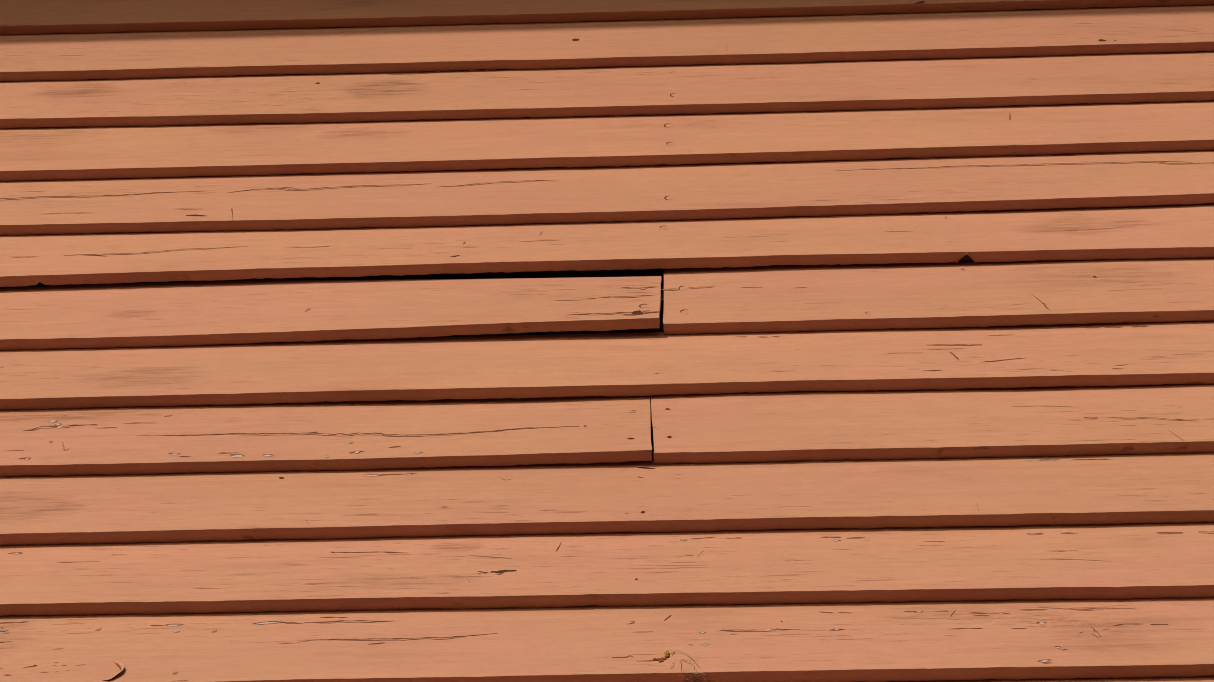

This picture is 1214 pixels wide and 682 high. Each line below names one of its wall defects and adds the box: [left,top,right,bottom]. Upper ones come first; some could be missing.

crack [7,415,574,451]